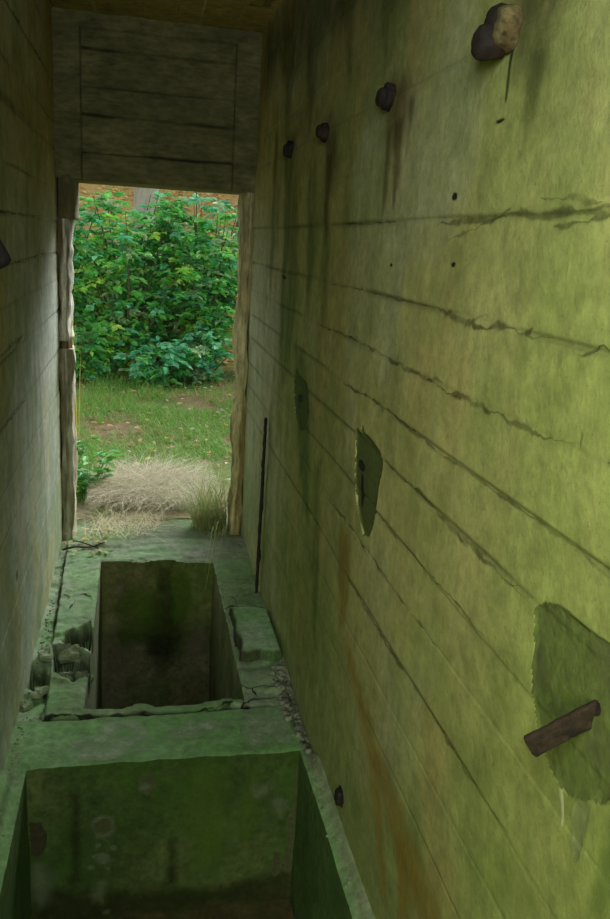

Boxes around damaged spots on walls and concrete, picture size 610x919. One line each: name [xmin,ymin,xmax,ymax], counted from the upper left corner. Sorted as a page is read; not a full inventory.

leakage [505,49,514,100]
crack [544,202,610,227]
crack [473,324,533,334]
spalling [293,367,309,431]
spalling [354,426,383,537]
spalling [55,560,244,709]
spalling [531,601,610,863]
spalling [0,720,352,919]